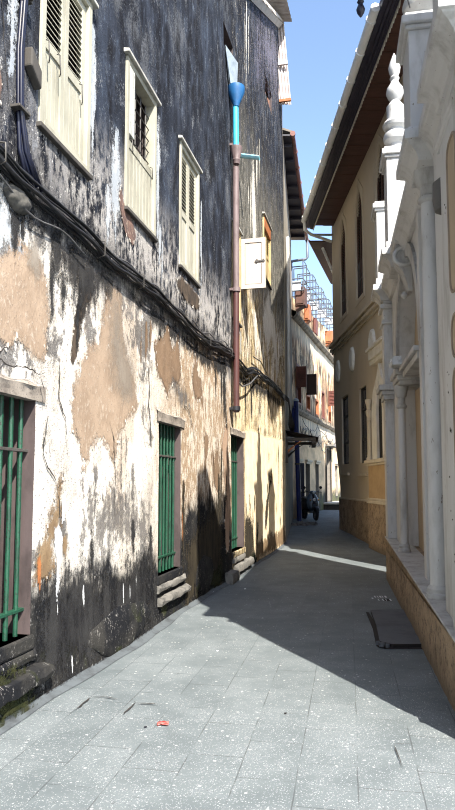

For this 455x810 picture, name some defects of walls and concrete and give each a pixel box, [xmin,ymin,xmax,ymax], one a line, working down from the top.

peeling [0,234,51,362]
crack [0,347,68,517]
water stain [29,469,158,698]
peeling [69,287,182,473]
water stain [120,436,135,506]
peeling [192,352,202,402]
water stain [182,448,227,607]